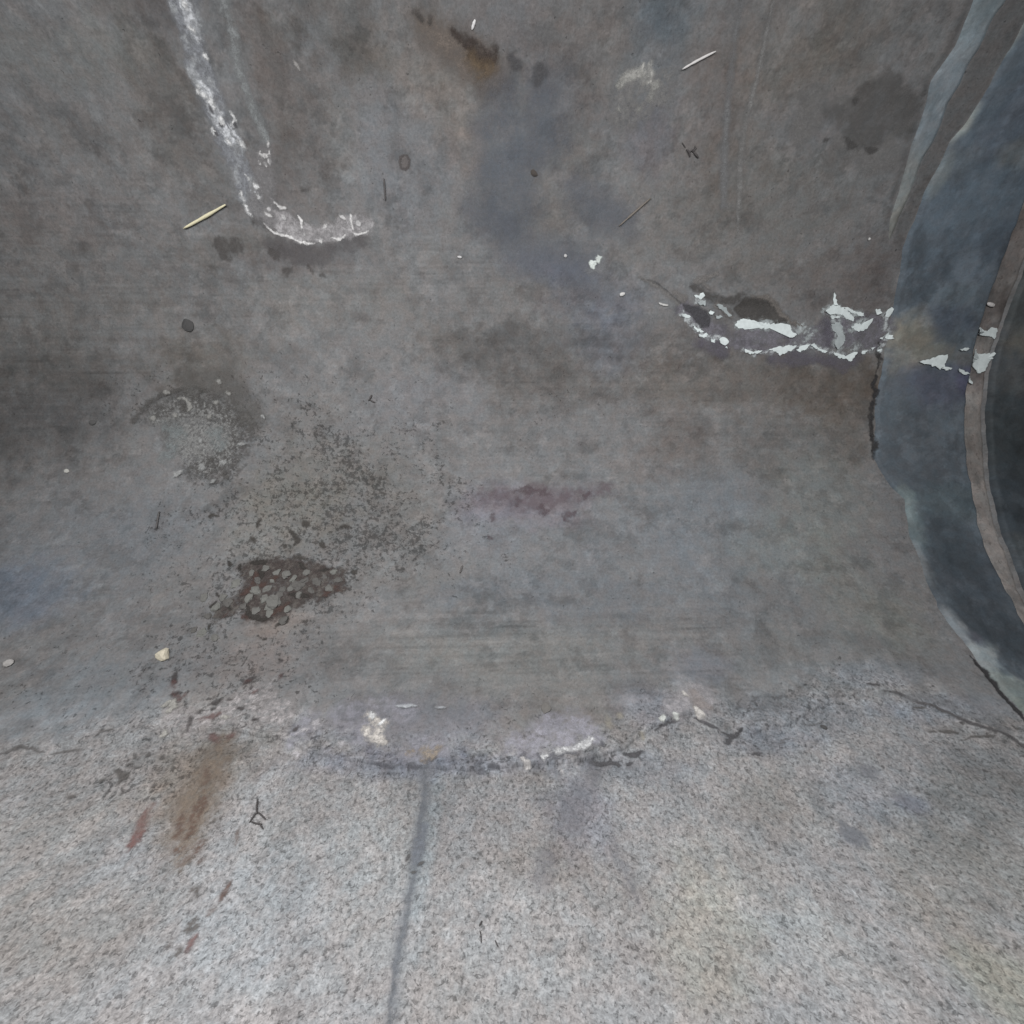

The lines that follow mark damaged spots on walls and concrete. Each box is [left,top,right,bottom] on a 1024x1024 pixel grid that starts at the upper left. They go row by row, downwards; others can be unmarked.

water stain [168,0,374,273]
peeling [659,271,894,369]
crack [868,340,883,457]
peeling [920,348,996,384]
peeling [978,327,998,339]